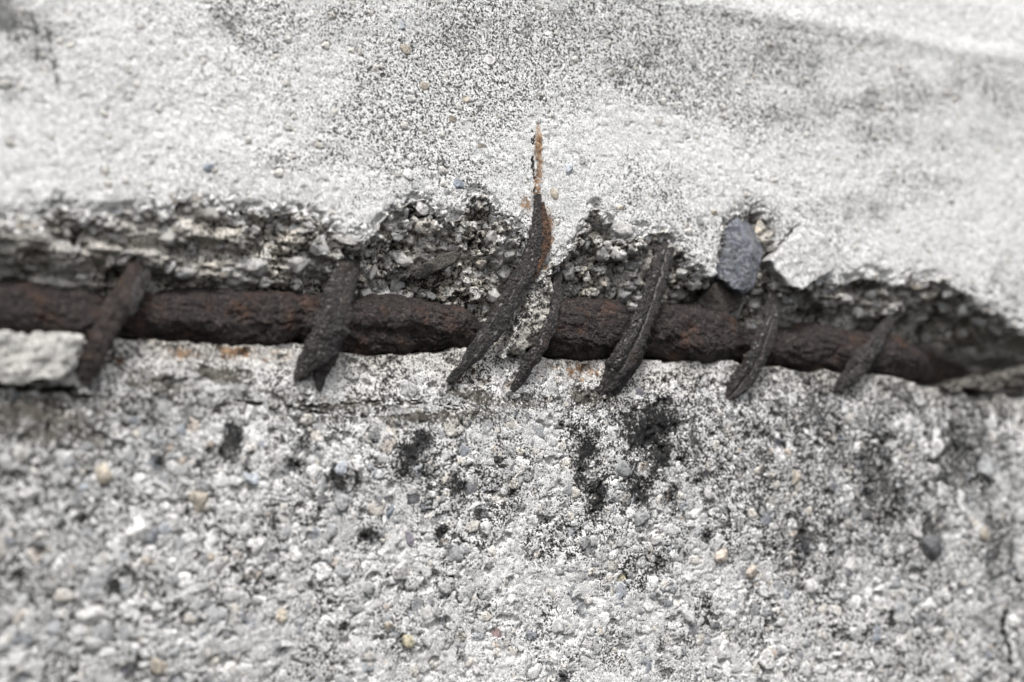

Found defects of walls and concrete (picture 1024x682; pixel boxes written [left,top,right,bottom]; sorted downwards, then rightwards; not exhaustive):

spalling [0,330,85,386]
rust [217,346,288,362]
spalling [0,191,527,324]
rust [520,123,555,282]
rust [537,361,599,382]
spalling [493,208,1024,399]